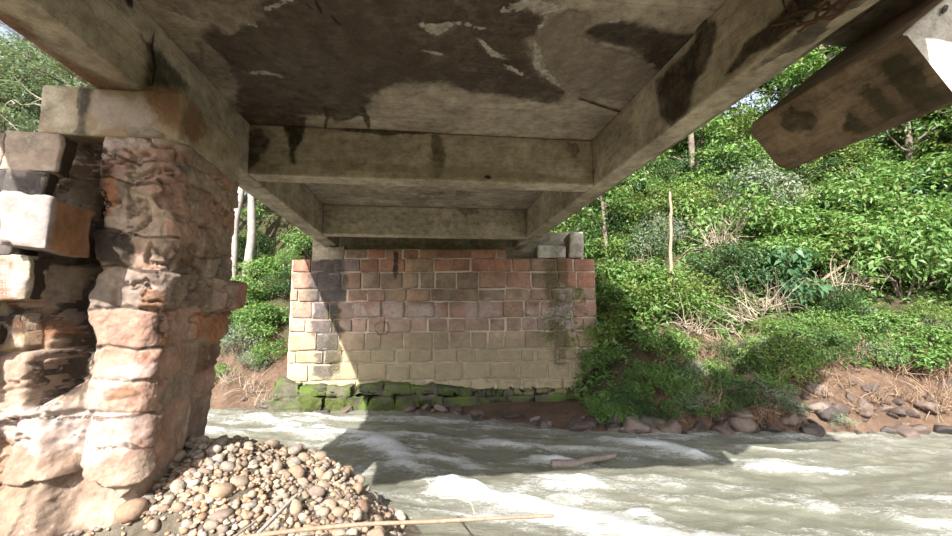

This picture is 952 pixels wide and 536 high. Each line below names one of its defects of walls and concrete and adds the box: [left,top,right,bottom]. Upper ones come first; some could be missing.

damp [156,0,568,176]
damp [587,17,716,126]